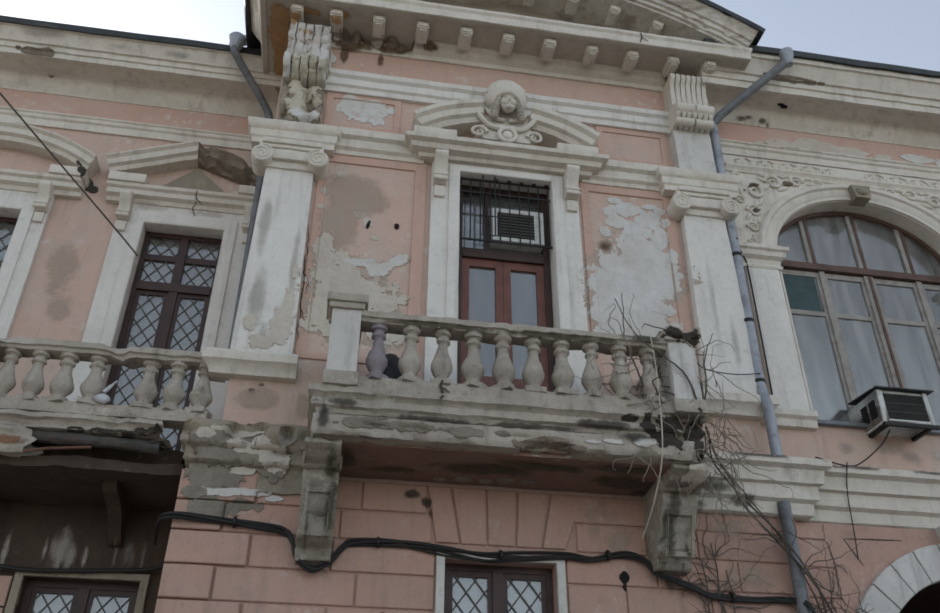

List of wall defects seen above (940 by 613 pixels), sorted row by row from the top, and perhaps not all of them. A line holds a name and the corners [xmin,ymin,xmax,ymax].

flaking render [283,25,415,127]
peeling [243,186,415,354]
peeling [579,197,703,348]
spalling [22,423,172,454]
flaking render [180,425,297,523]
leakage [446,462,580,476]
spalling [333,407,709,496]